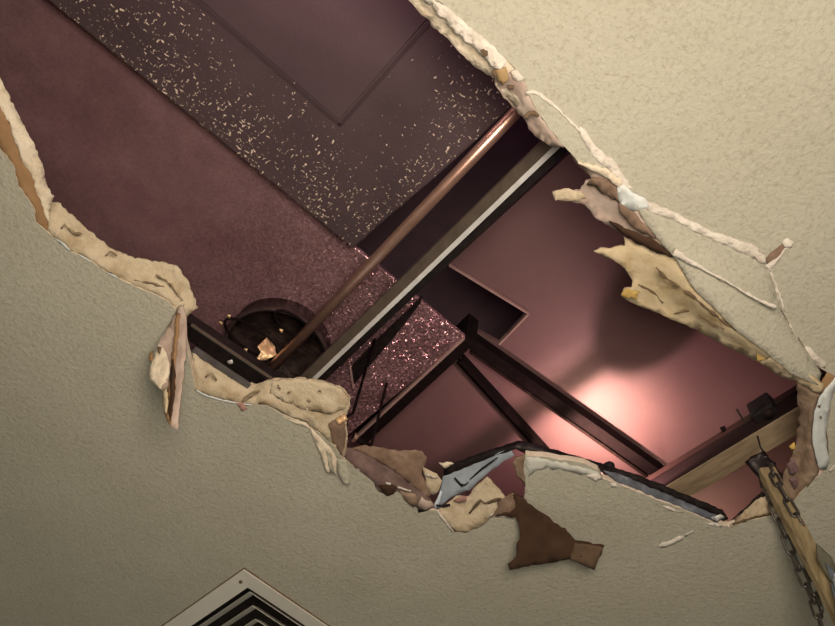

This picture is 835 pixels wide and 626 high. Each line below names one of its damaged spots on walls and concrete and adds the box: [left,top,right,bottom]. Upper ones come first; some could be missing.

flaking render [409,0,565,148]
crack [525,90,759,259]
flaking render [47,202,198,316]
crack [672,249,778,310]
flaking render [192,353,351,458]
flaking render [594,235,835,500]
flaking render [437,476,515,533]
peeling [513,454,618,487]
flaking render [703,491,777,528]